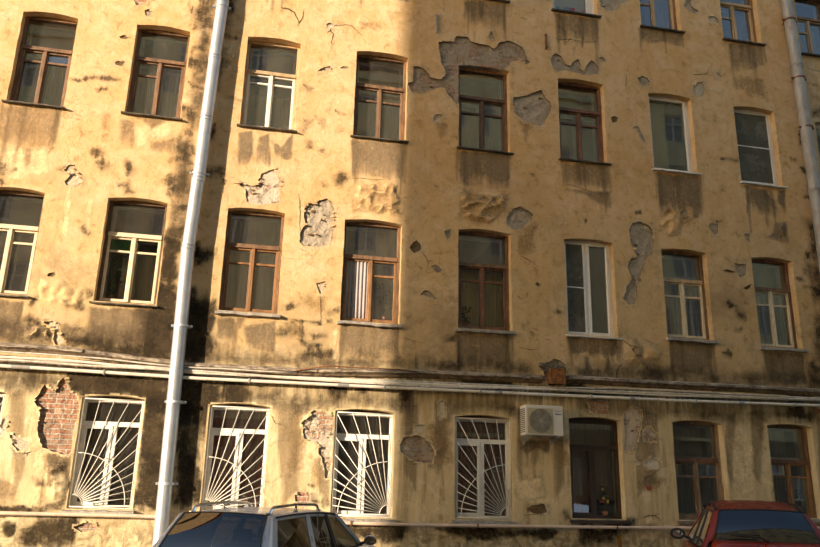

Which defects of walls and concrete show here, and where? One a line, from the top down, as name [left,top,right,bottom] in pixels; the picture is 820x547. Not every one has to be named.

spalling [408,28,530,105]
spalling [510,88,554,128]
damp [0,0,214,511]
spalling [231,166,284,207]
spalling [297,197,337,250]
damp [184,287,401,368]
spalling [0,375,81,458]
damp [173,374,280,509]
spalling [299,407,334,478]
damp [0,454,77,547]
damp [347,525,408,543]
damp [435,527,558,541]